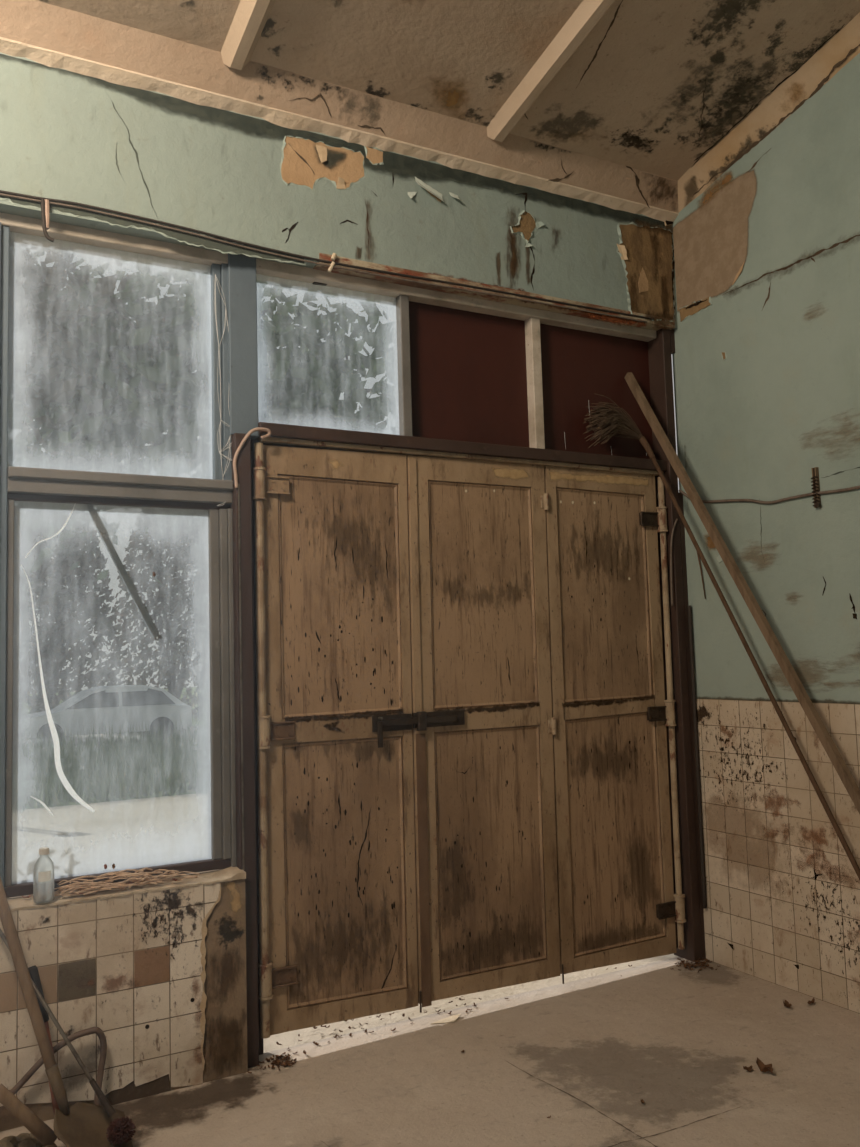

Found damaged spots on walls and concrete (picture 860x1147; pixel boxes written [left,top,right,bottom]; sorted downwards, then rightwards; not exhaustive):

damp [261,19,280,56]
crack [576,0,623,88]
damp [611,0,842,156]
crack [111,100,158,218]
peeling [280,136,384,191]
damp [0,54,671,227]
damp [701,129,767,205]
spalling [510,210,545,247]
flaking render [616,170,757,322]
spalling [200,883,221,1071]